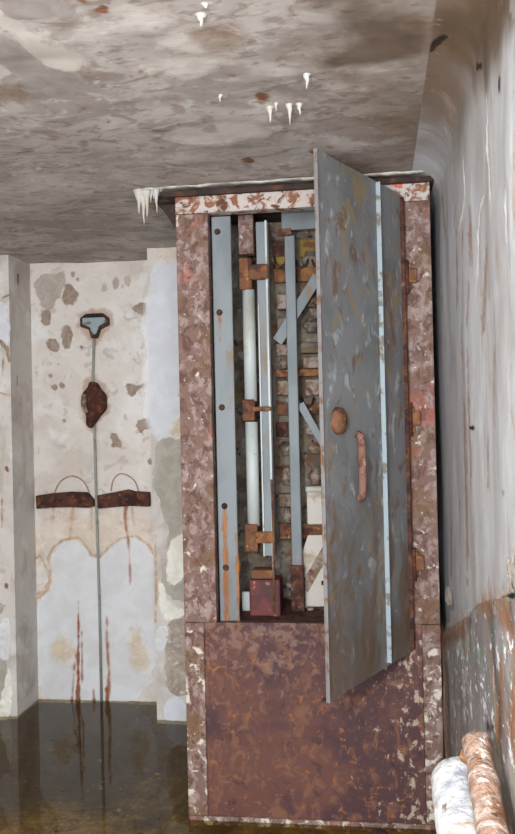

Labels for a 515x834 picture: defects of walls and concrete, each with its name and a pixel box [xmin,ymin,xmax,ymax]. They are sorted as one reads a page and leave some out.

leakage [132,177,314,225]
rust [71,614,83,704]
leakage [37,536,157,705]
spalling [148,437,187,722]
rust [440,618,468,758]